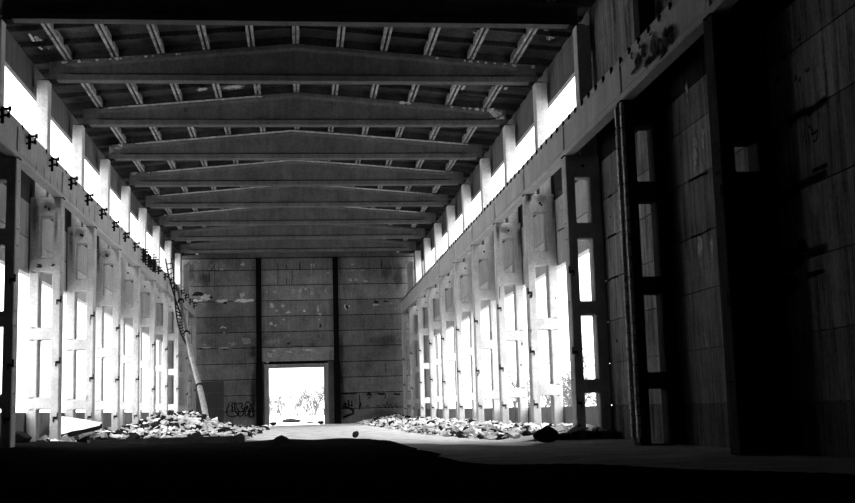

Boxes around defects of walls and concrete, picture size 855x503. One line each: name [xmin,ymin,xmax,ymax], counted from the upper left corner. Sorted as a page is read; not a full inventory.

spalling [192,292,255,304]